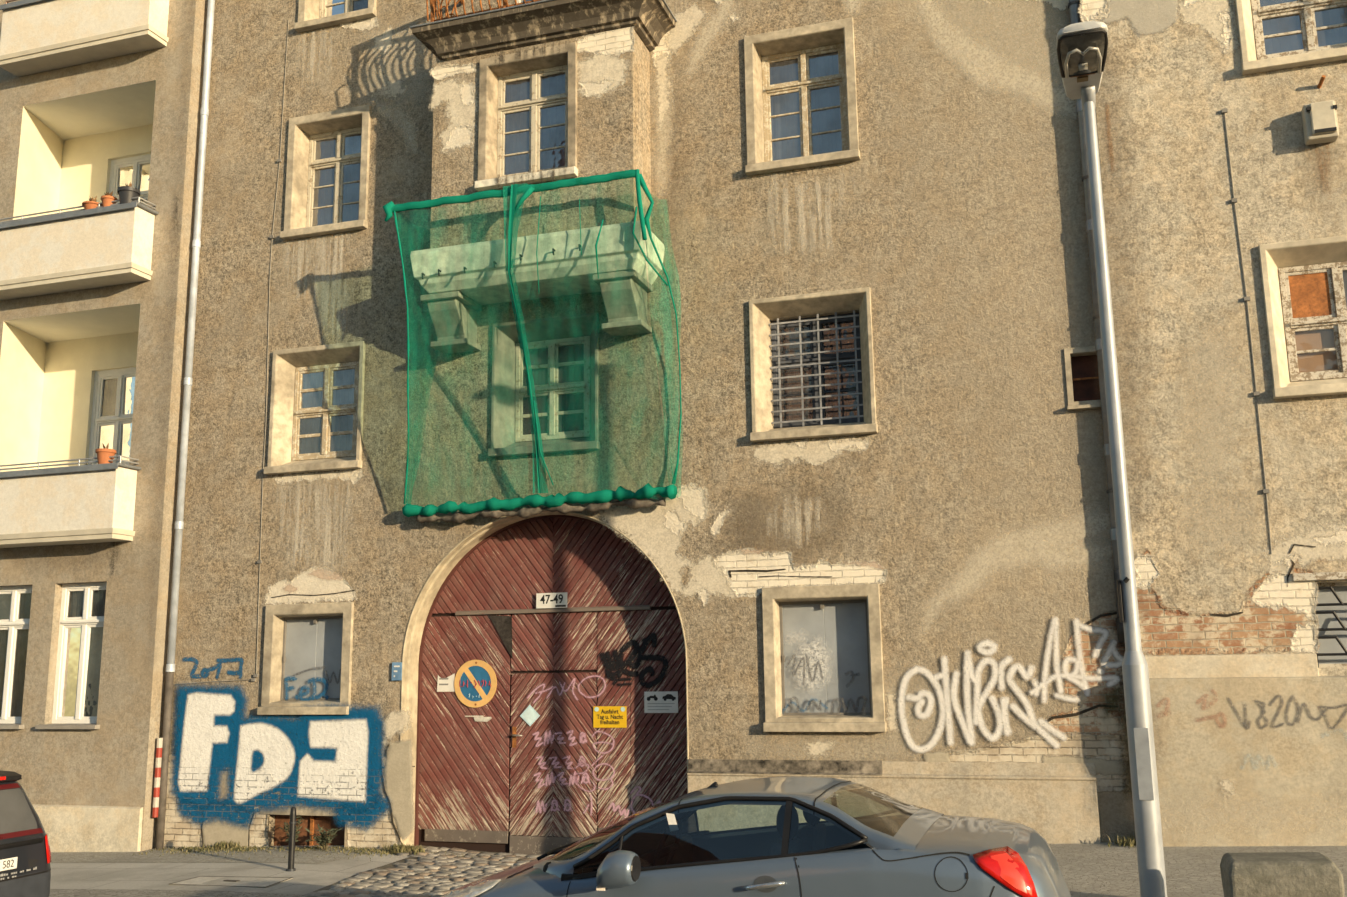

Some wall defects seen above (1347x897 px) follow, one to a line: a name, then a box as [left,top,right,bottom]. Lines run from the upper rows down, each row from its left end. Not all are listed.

flaking render [429,63,478,153]
flaking render [576,27,635,98]
flaking render [652,2,706,132]
flaking render [1026,0,1111,22]
flaking render [1175,0,1240,54]
flaking render [752,435,873,468]
flaking render [264,565,358,605]
flaking render [595,482,888,606]
flaking render [1134,521,1347,656]
flaking render [924,611,1132,793]